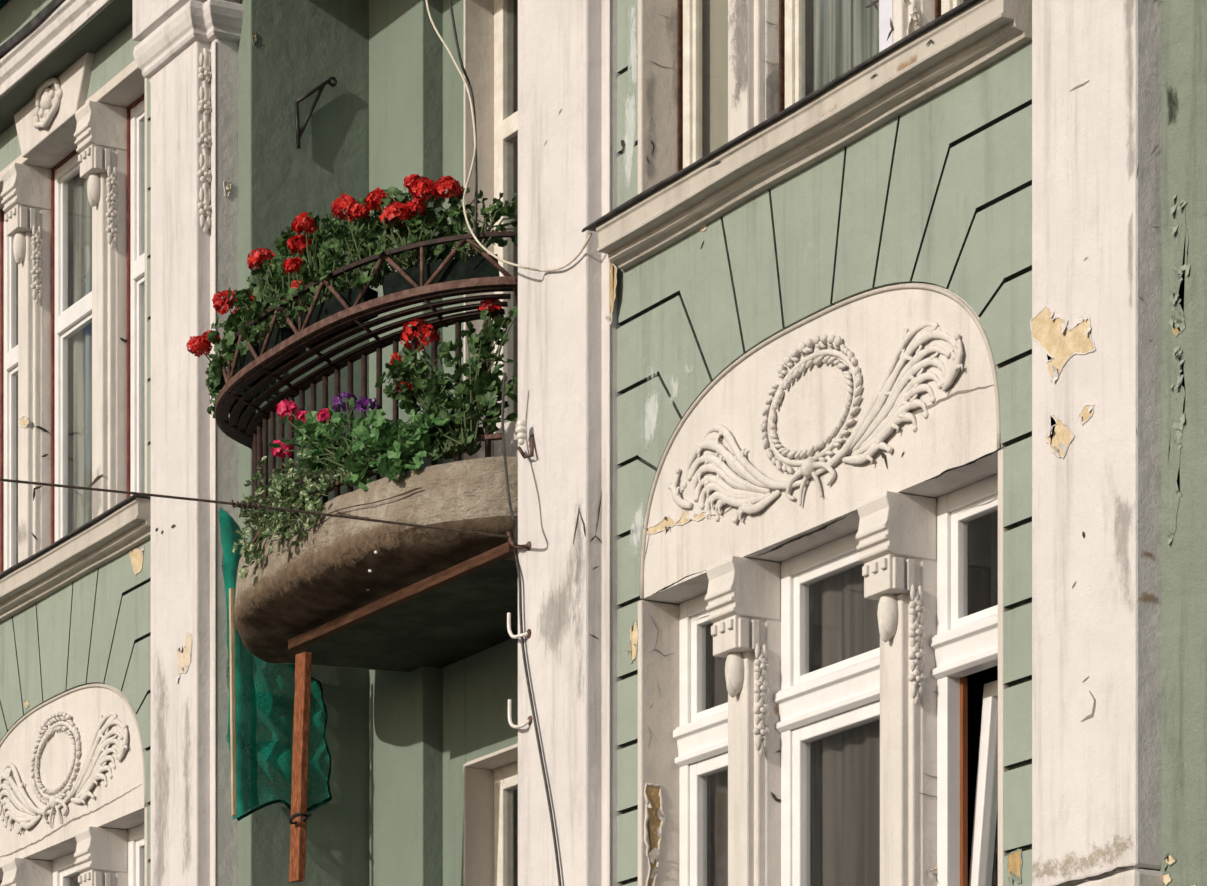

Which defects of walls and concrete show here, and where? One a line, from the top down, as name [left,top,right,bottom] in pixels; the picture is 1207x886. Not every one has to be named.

flaking render [1030,305,1096,382]
peeling [1167,194,1190,545]
flaking render [1045,403,1095,460]
flaking render [645,510,712,535]
flaking render [175,632,192,682]
flaking render [644,783,667,886]